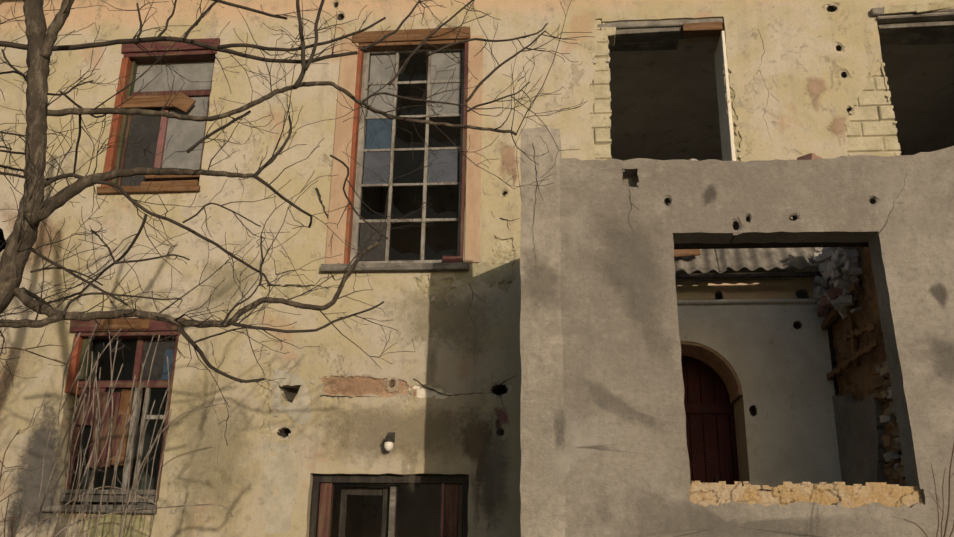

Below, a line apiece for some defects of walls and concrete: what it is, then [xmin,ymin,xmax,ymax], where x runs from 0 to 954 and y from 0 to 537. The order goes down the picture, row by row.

peeling [412,235,516,310]
water stain [933,286,946,304]
crack [413,283,519,411]
peeling [270,369,314,443]
spalling [407,381,454,403]
water stain [6,405,60,532]